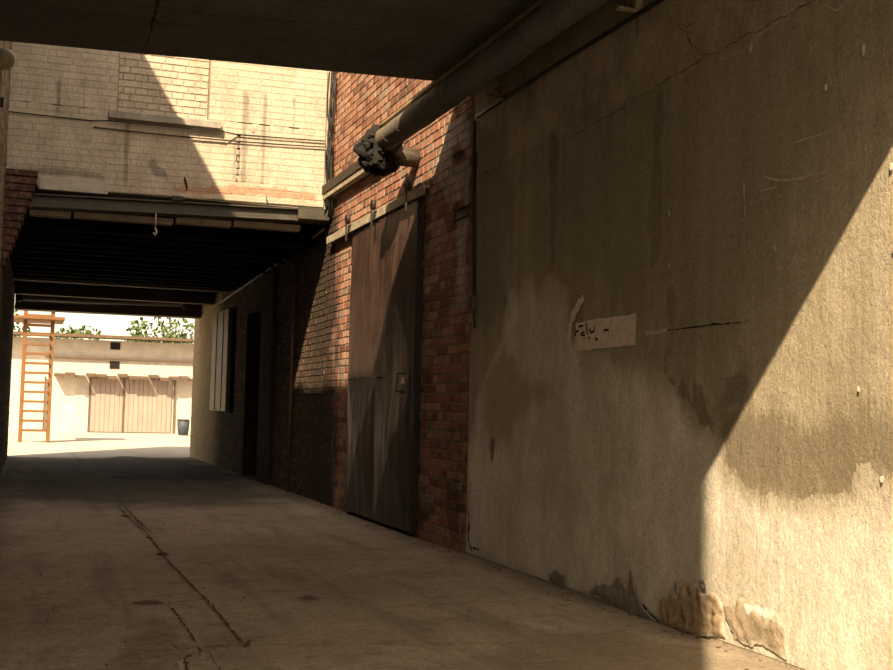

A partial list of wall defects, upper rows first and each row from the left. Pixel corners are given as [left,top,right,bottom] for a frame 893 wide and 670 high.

leakage [423,0,893,670]
crack [645,321,747,336]
crack [73,453,251,670]
spalling [589,567,787,660]